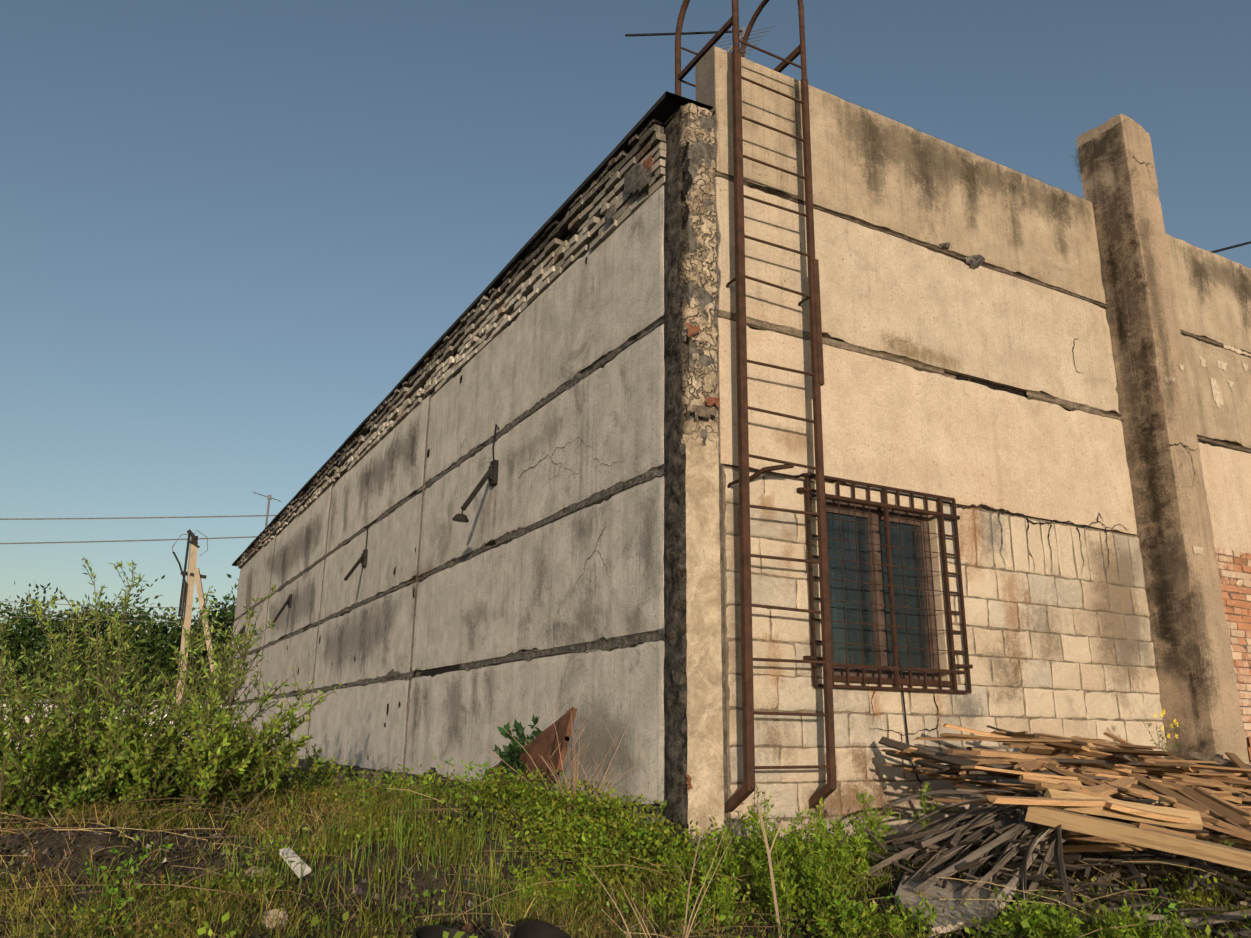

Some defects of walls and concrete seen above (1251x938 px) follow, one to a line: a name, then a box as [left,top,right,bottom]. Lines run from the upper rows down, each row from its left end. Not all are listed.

damp [1077,124,1123,179]
spalling [683,141,693,221]
peeling [1199,356,1234,408]
crack [519,437,624,483]